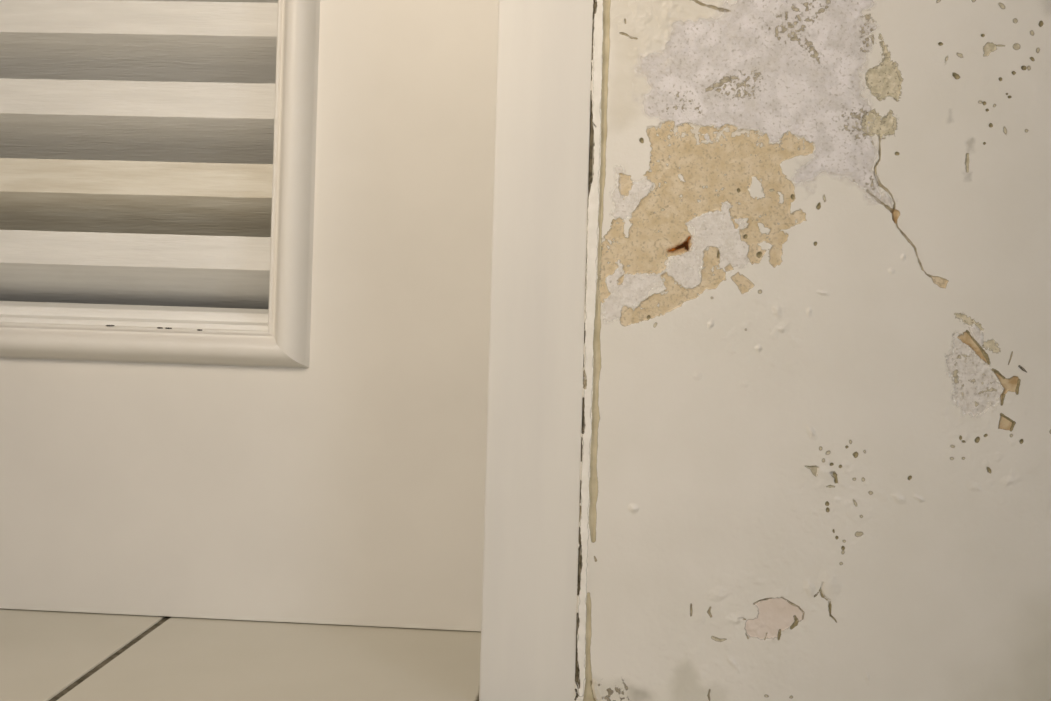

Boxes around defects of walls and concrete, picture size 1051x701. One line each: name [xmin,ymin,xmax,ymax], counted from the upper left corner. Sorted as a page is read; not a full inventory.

damp [641,0,884,201]
peeling [589,0,826,543]
crack [866,136,948,288]
flaking render [947,313,1023,460]
peeling [583,593,596,701]
peeling [743,597,804,640]